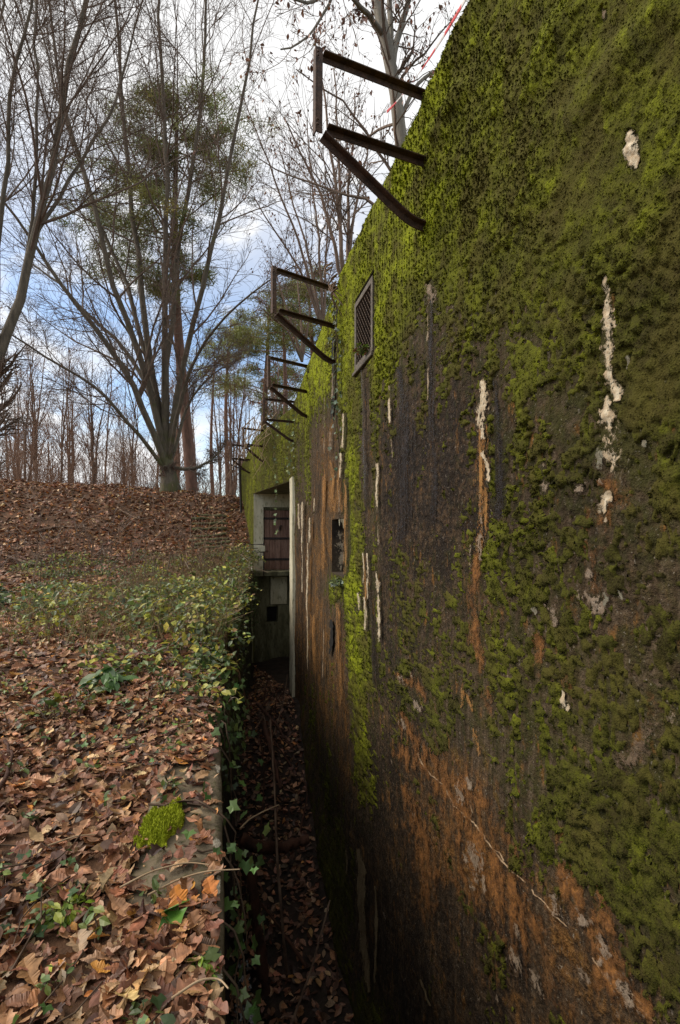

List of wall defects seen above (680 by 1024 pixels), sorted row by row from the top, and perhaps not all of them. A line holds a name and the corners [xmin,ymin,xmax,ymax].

peeling [622,130,640,168]
peeling [595,276,630,470]
peeling [473,379,490,560]
rust [466,530,484,671]
peeling [570,569,623,614]
crack [419,758,567,927]
rust [390,672,654,1019]